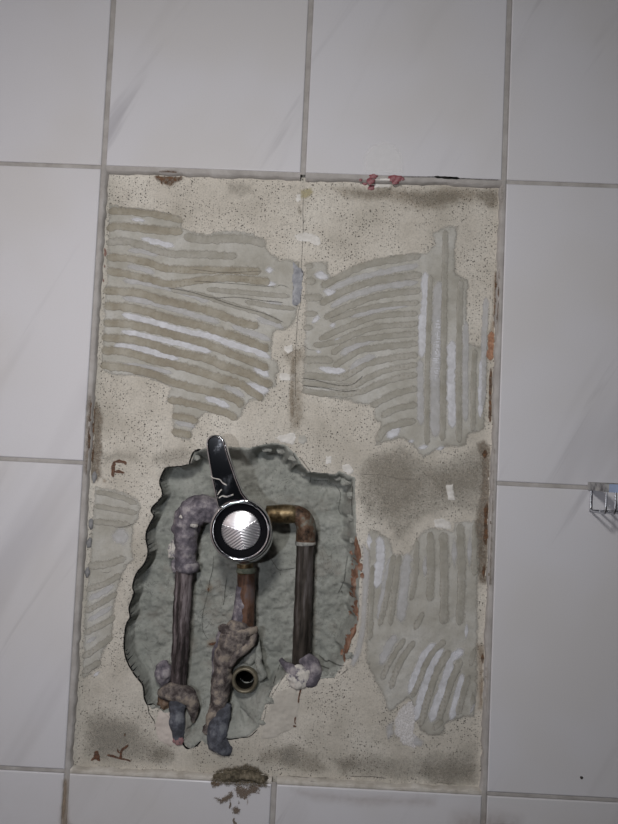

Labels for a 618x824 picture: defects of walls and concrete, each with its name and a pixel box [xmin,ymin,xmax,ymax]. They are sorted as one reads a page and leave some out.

rust [156,171,182,185]
spalling [125,447,215,716]
spalling [184,523,237,749]
spalling [226,523,296,739]
spalling [228,443,364,679]